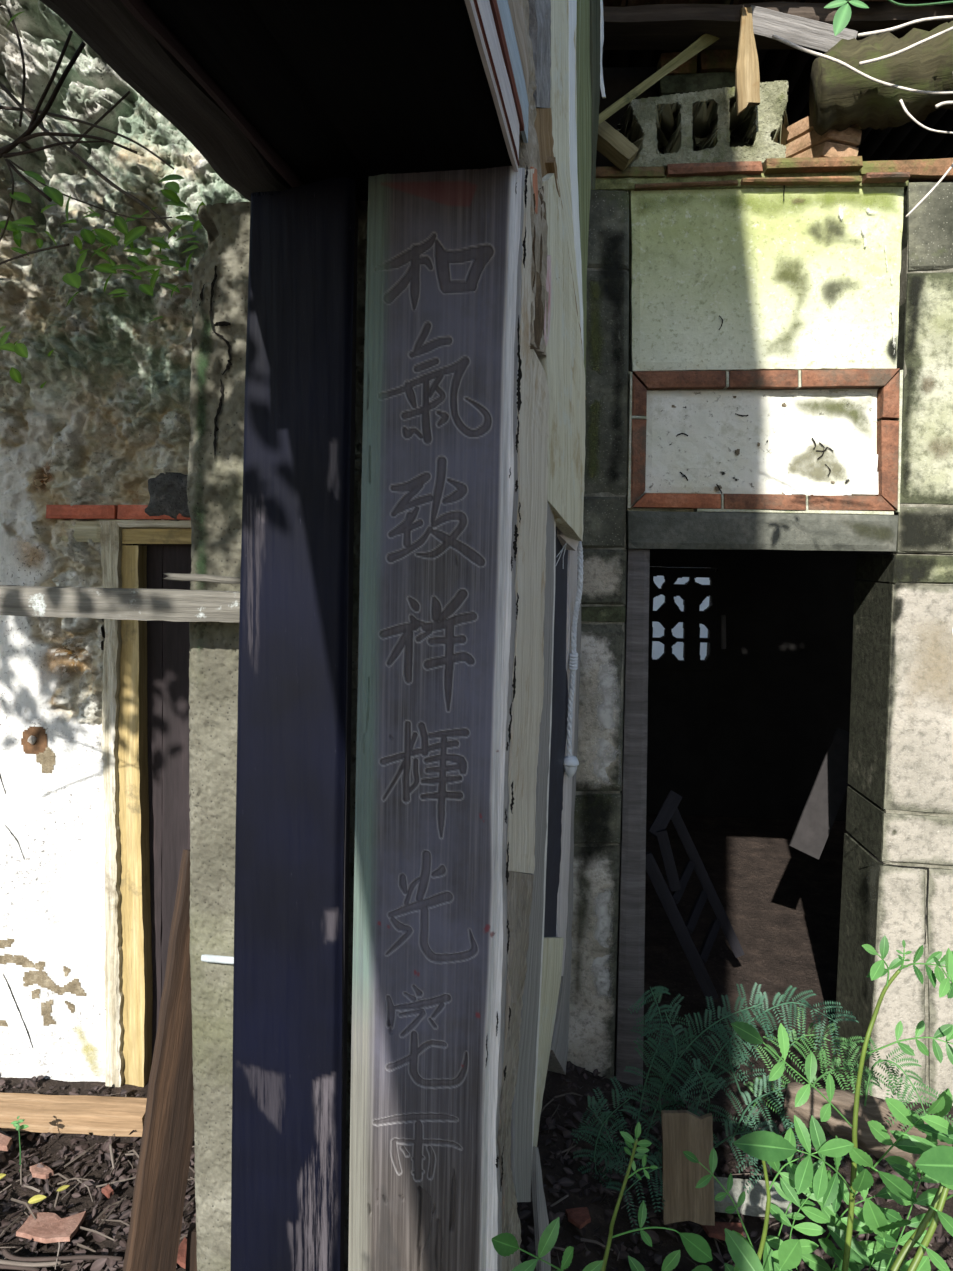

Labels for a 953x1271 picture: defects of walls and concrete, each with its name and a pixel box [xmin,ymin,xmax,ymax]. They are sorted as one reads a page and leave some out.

water stain [812,207,844,241]
water stain [777,262,805,289]
water stain [825,282,848,300]
water stain [789,445,844,480]
rust [21,726,47,754]
water stain [595,668,615,780]
water stain [577,787,611,995]
peeling [0,938,86,1026]